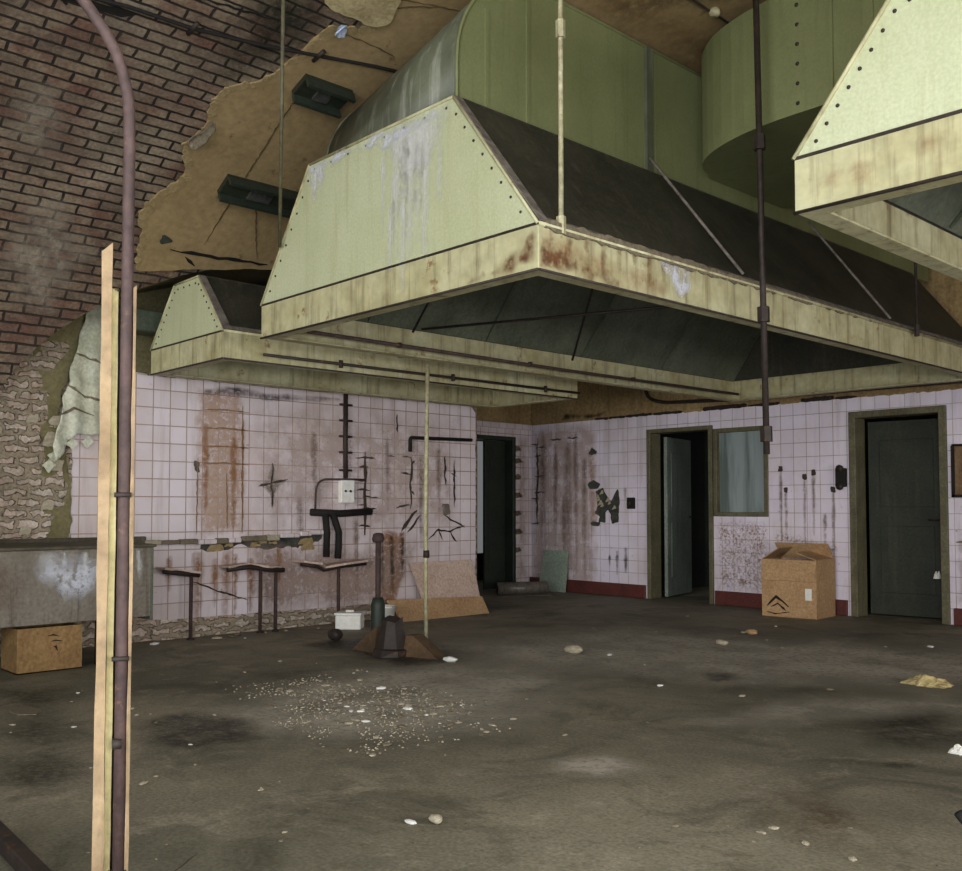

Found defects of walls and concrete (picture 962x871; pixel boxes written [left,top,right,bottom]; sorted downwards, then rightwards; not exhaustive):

flaking render [134,0,401,264]
damp [382,119,440,257]
rust [505,236,571,270]
spalling [0,305,102,539]
rust [196,394,249,534]
damp [536,430,592,580]